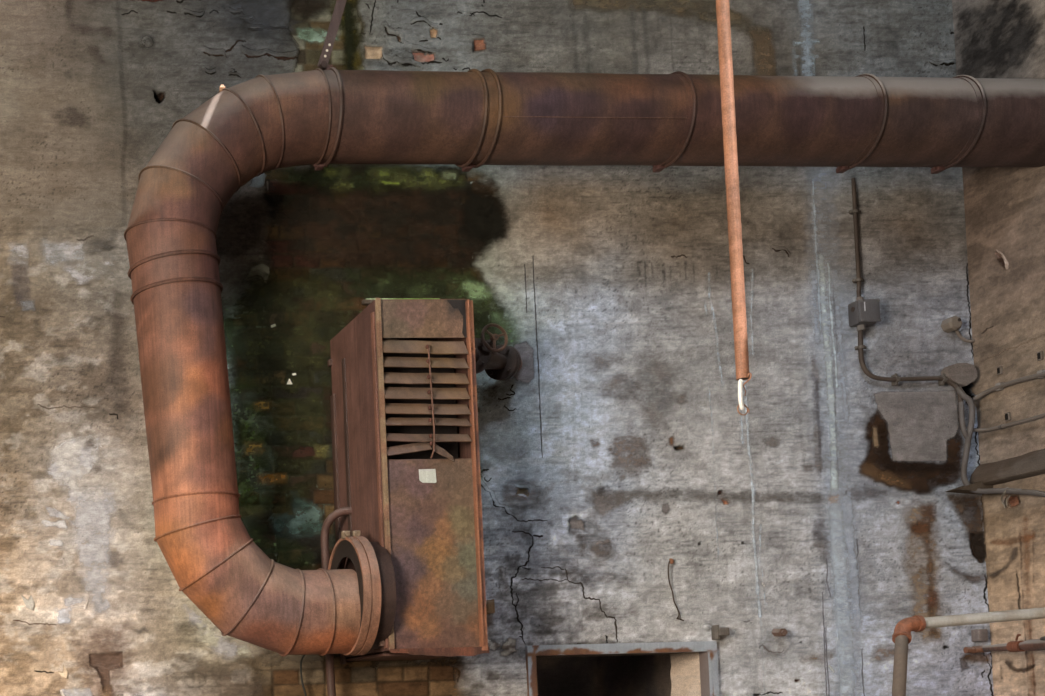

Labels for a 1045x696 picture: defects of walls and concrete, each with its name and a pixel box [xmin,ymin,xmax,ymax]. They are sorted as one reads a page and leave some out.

flaking render [287,0,382,72]
leakage [463,190,507,241]
mould [271,499,323,537]
crack [480,468,618,645]
crack [981,652,994,696]